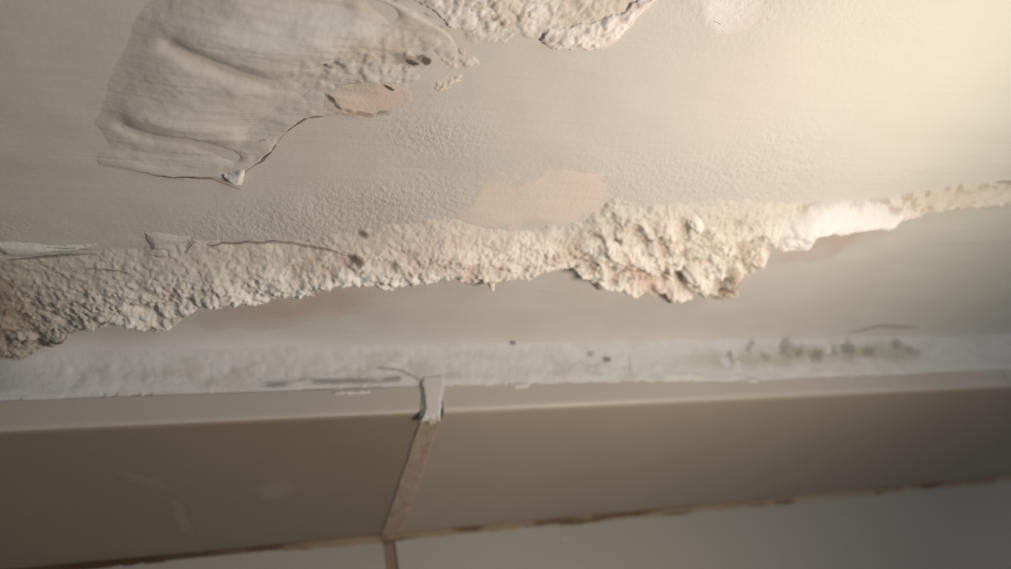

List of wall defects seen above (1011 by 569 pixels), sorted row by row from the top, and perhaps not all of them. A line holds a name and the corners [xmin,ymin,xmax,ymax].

flaking render [409,0,656,103]
crack [140,114,338,190]
peeling [329,96,390,118]
flaking render [0,179,1011,359]